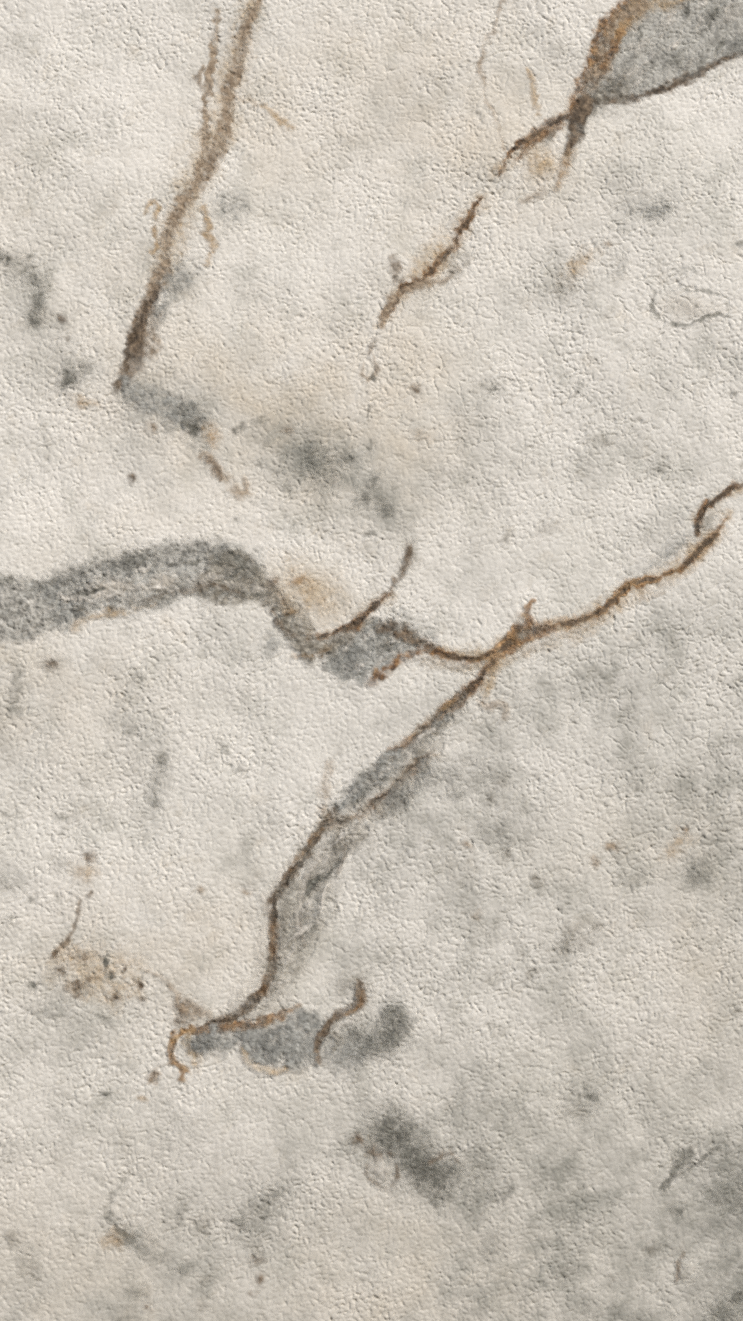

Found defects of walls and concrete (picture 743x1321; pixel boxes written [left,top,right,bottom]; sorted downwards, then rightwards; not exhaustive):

crack [500,69,593,173]
crack [380,198,481,328]
crack [149,483,740,1082]